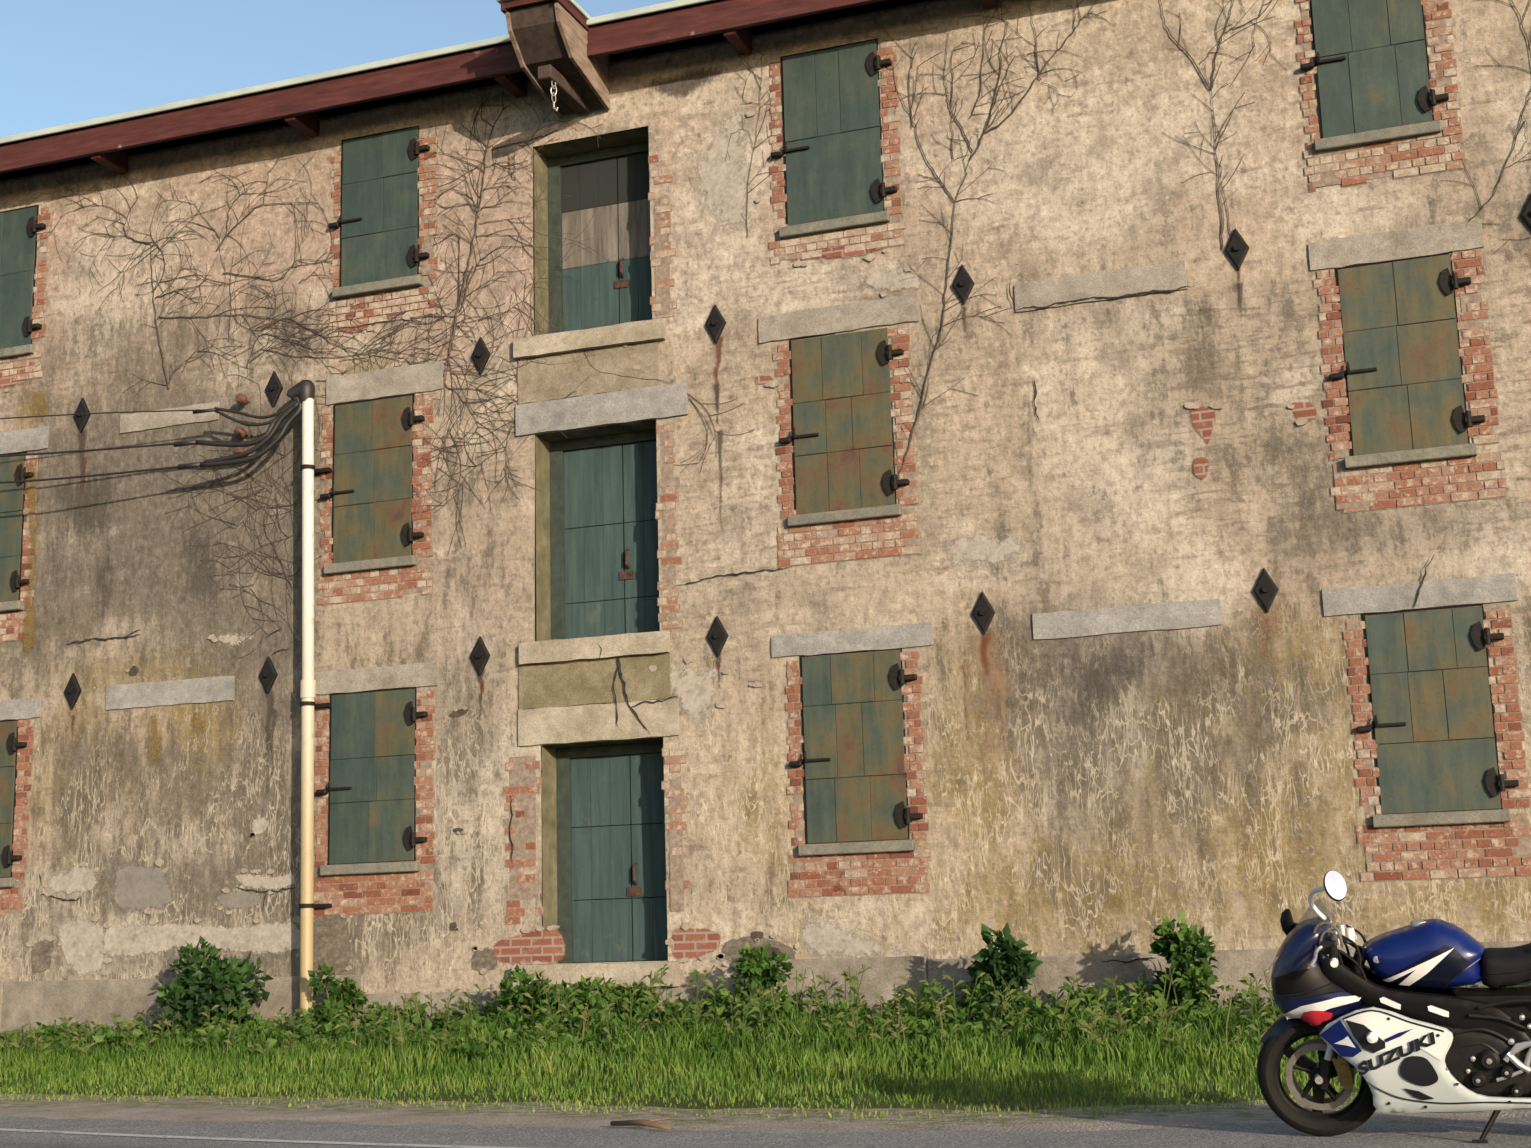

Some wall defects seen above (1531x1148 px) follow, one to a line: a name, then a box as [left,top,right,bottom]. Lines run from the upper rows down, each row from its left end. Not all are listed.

spalling [1184,402,1223,479]
crack [598,644,680,734]
corrosion [963,633,1009,769]
peeling [42,863,100,900]
peeling [26,869,352,978]
spalling [471,925,565,975]